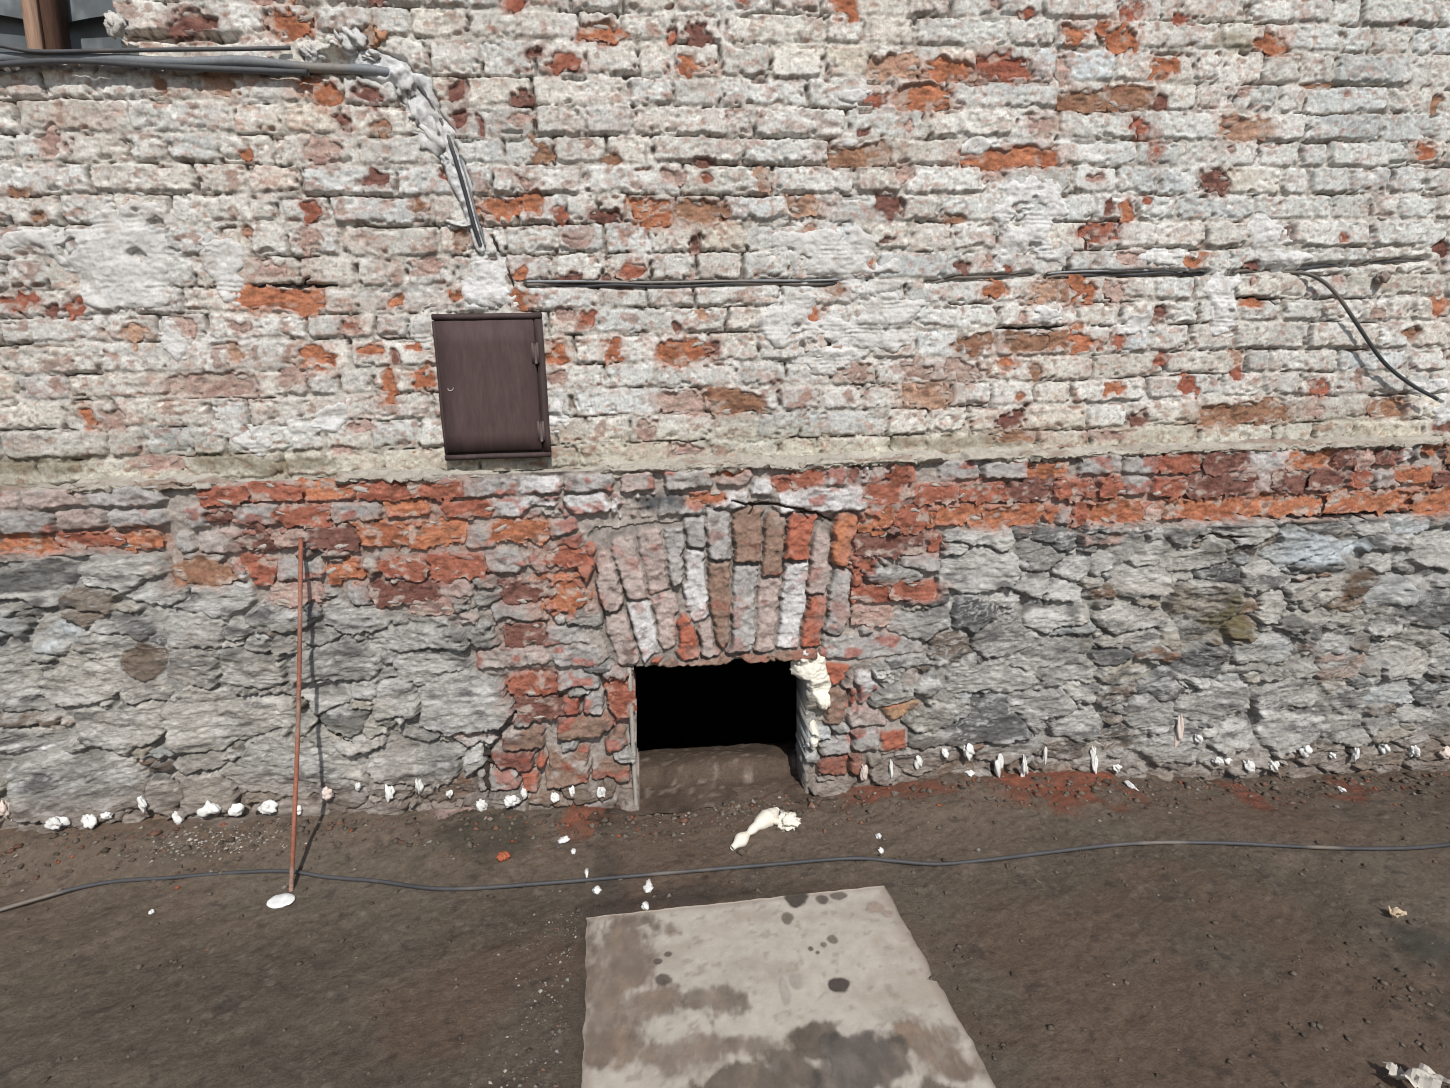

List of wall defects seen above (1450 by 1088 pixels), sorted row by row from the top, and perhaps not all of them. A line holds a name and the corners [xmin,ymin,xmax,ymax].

spalling [229,259,326,362]
spalling [689,470,734,504]
spalling [771,464,827,492]
crack [734,501,830,520]
spalling [0,526,164,554]
spalling [171,477,594,649]